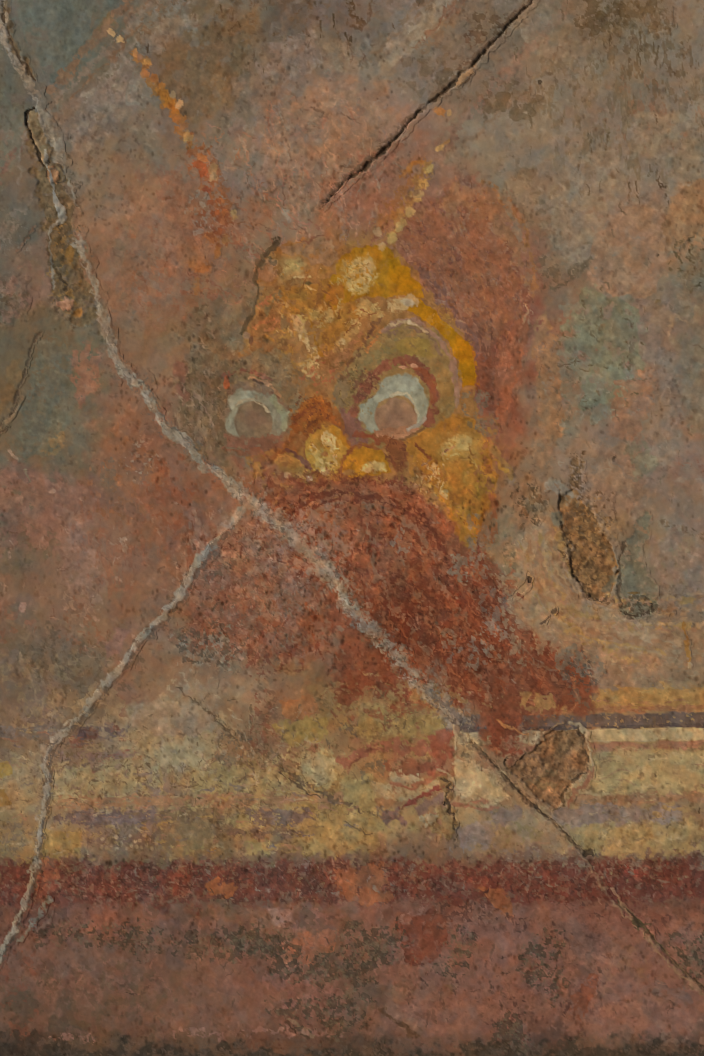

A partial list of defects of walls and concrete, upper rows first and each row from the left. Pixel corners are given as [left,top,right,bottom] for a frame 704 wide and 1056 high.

crack [315,0,540,213]
crack [0,329,44,434]
crack [504,570,534,602]
crack [539,606,558,626]
flaking render [510,451,686,629]
crack [0,500,252,969]
crack [266,756,377,837]
flaking render [502,720,599,814]